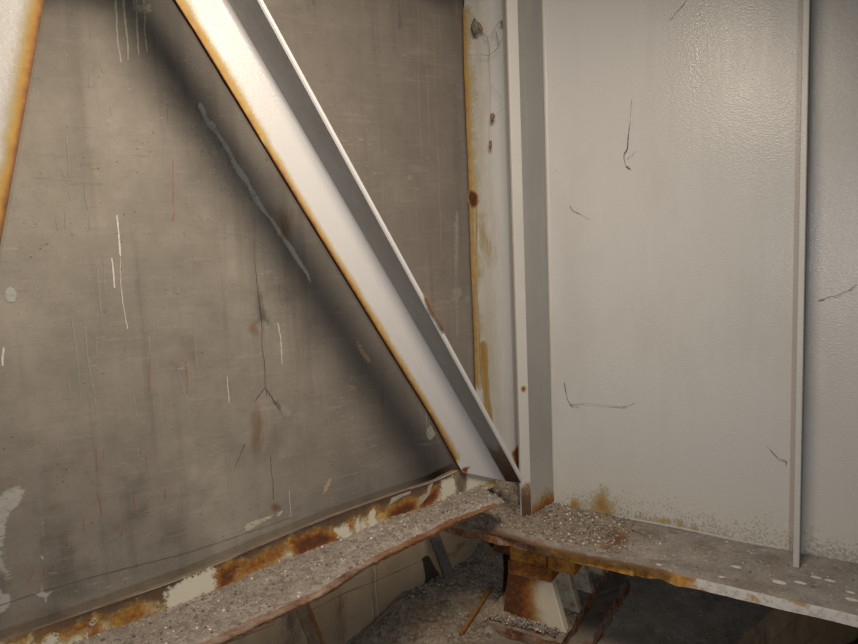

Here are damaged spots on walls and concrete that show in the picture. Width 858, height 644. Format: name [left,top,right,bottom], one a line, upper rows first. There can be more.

corrosion [463,8,492,420]
crack [254,213,262,327]
corrosion [0,0,469,644]
crack [255,348,277,405]
corrosion [568,488,614,515]
peeling [0,590,12,613]
corrosion [504,573,539,621]